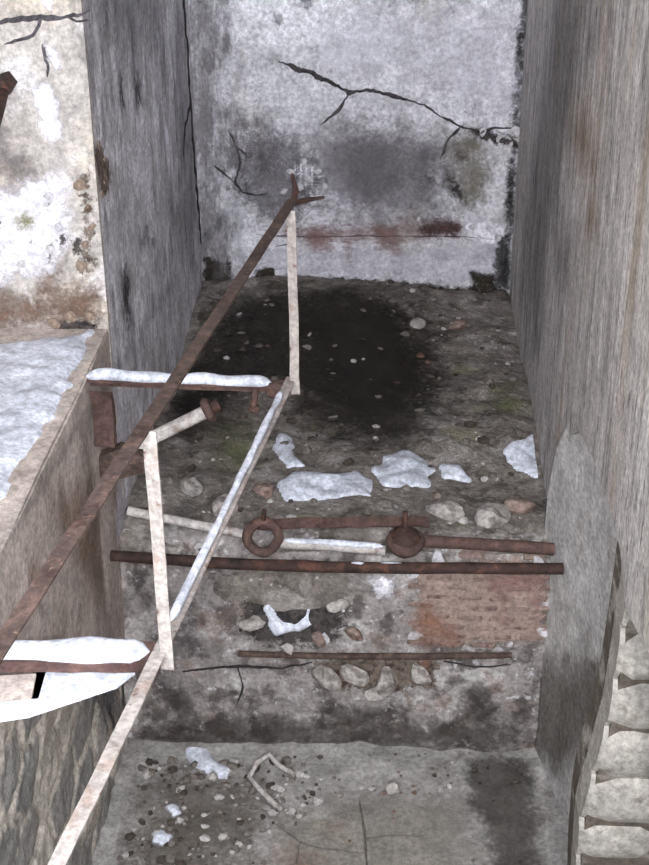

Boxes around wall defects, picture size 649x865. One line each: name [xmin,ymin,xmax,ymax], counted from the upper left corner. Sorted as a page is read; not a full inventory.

crack [0,10,90,77]
crack [182,0,268,244]
crack [278,61,519,159]
rust [256,515,430,530]
water stain [142,686,541,865]